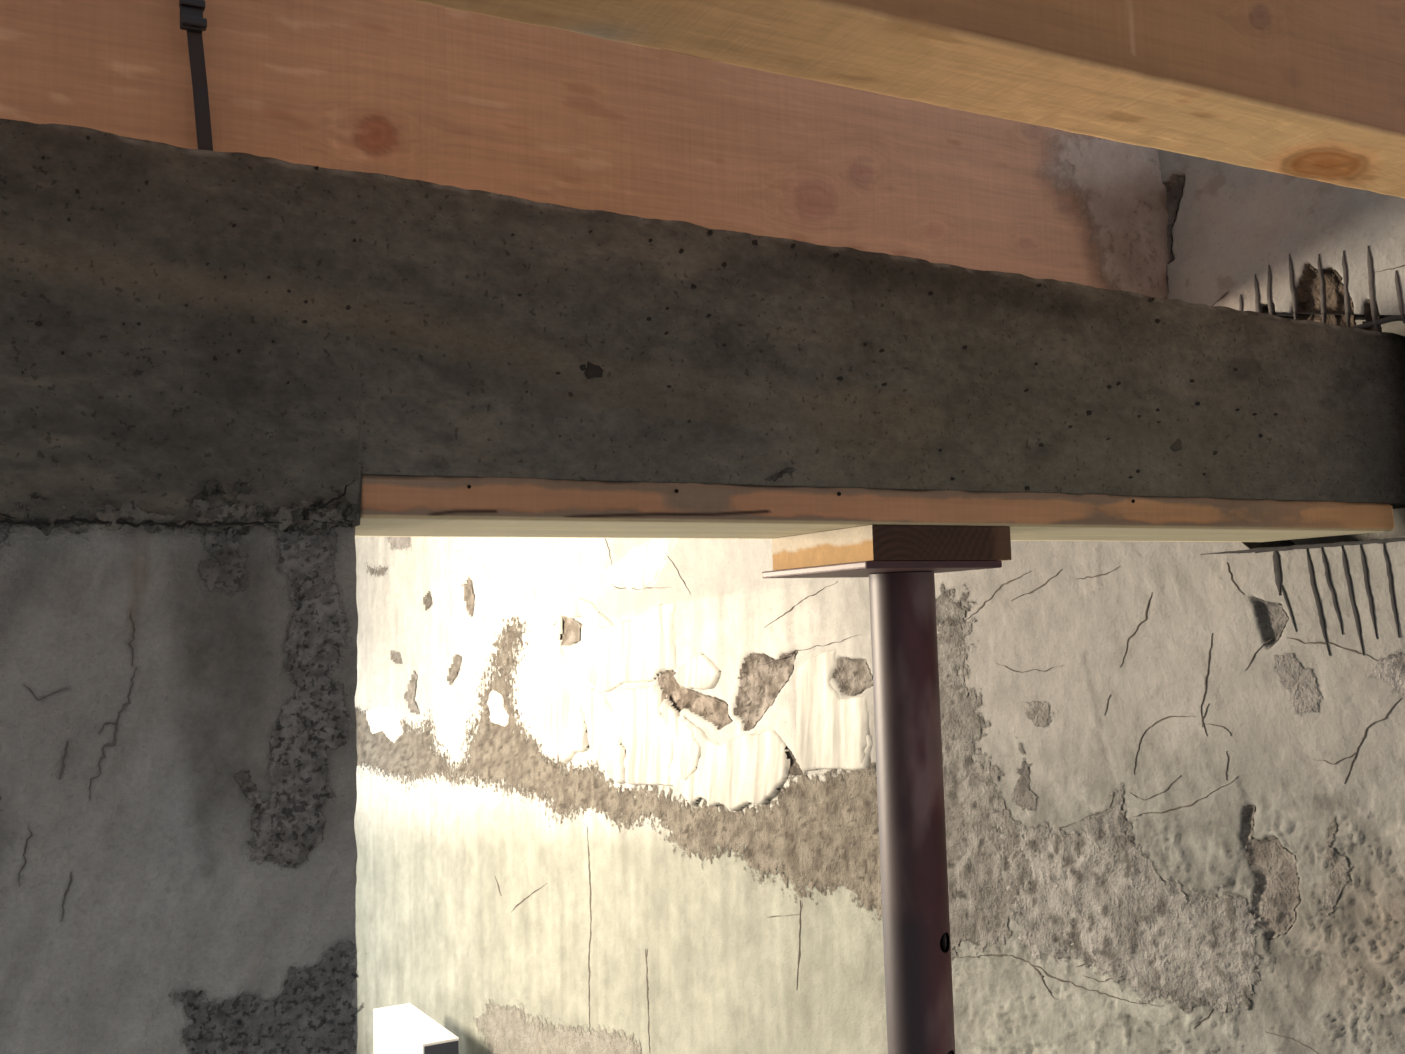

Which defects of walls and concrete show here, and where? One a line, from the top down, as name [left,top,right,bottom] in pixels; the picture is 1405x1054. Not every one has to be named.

spalling [1163,174,1184,264]
spalling [1262,264,1385,340]
spalling [423,591,433,610]
crack [965,566,1120,621]
crack [1104,594,1152,716]
spalling [1251,597,1323,716]
crack [1245,637,1377,671]
peeling [355,598,882,920]
spalling [935,581,1300,1014]
crack [1058,633,1237,828]
crack [1312,698,1401,784]
crack [958,954,1157,1006]